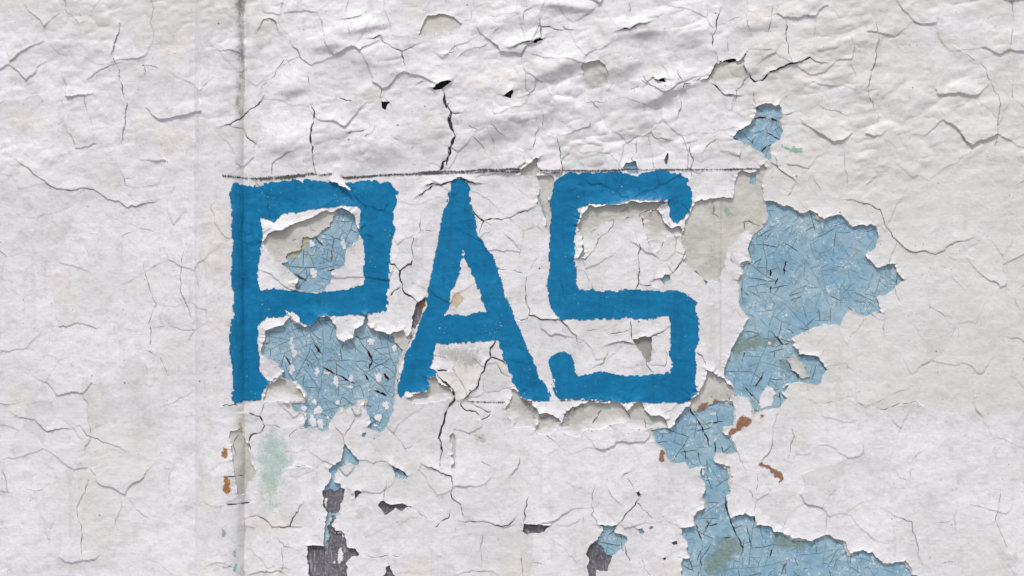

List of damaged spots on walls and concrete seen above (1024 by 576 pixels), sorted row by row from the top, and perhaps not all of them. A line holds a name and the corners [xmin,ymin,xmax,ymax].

crack [222,60,357,173]
crack [347,15,475,298]
crack [630,8,816,194]
peeling [261,205,362,294]
peeling [307,444,361,576]
crack [286,336,389,396]
peeling [258,298,456,437]
crack [364,340,527,575]
peeling [501,100,926,576]
crack [683,332,799,574]
rust [728,415,763,436]
rust [759,462,784,483]